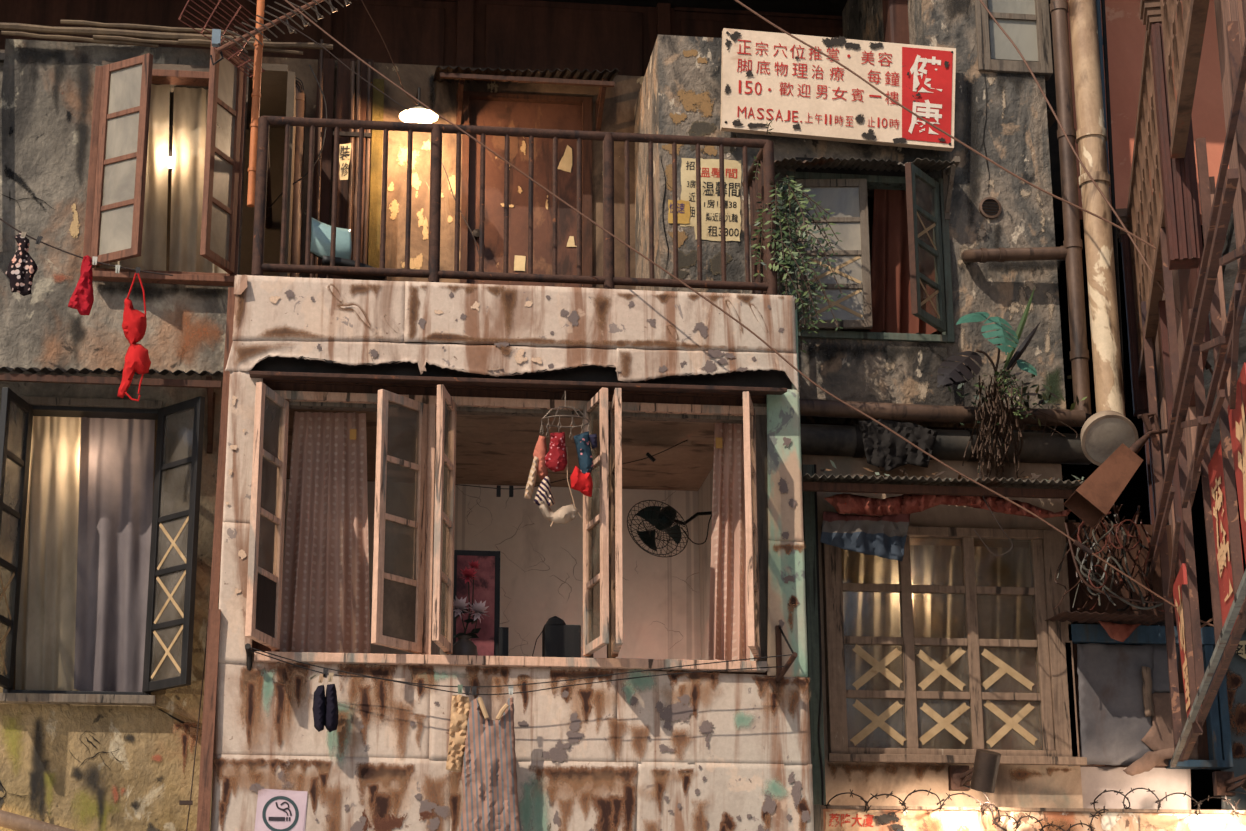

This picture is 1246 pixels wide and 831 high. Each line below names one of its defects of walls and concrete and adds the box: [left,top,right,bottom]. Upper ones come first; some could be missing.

peeling [778,478,797,508]
rust [466,666,532,710]
rust [550,669,613,730]
rust [667,670,718,717]
rust [752,676,810,718]
peeling [542,711,584,764]
peeling [647,693,714,753]
rust [530,766,637,831]
rust [652,768,693,813]
rust [719,812,737,831]
rust [761,802,771,830]
rust [797,798,810,831]